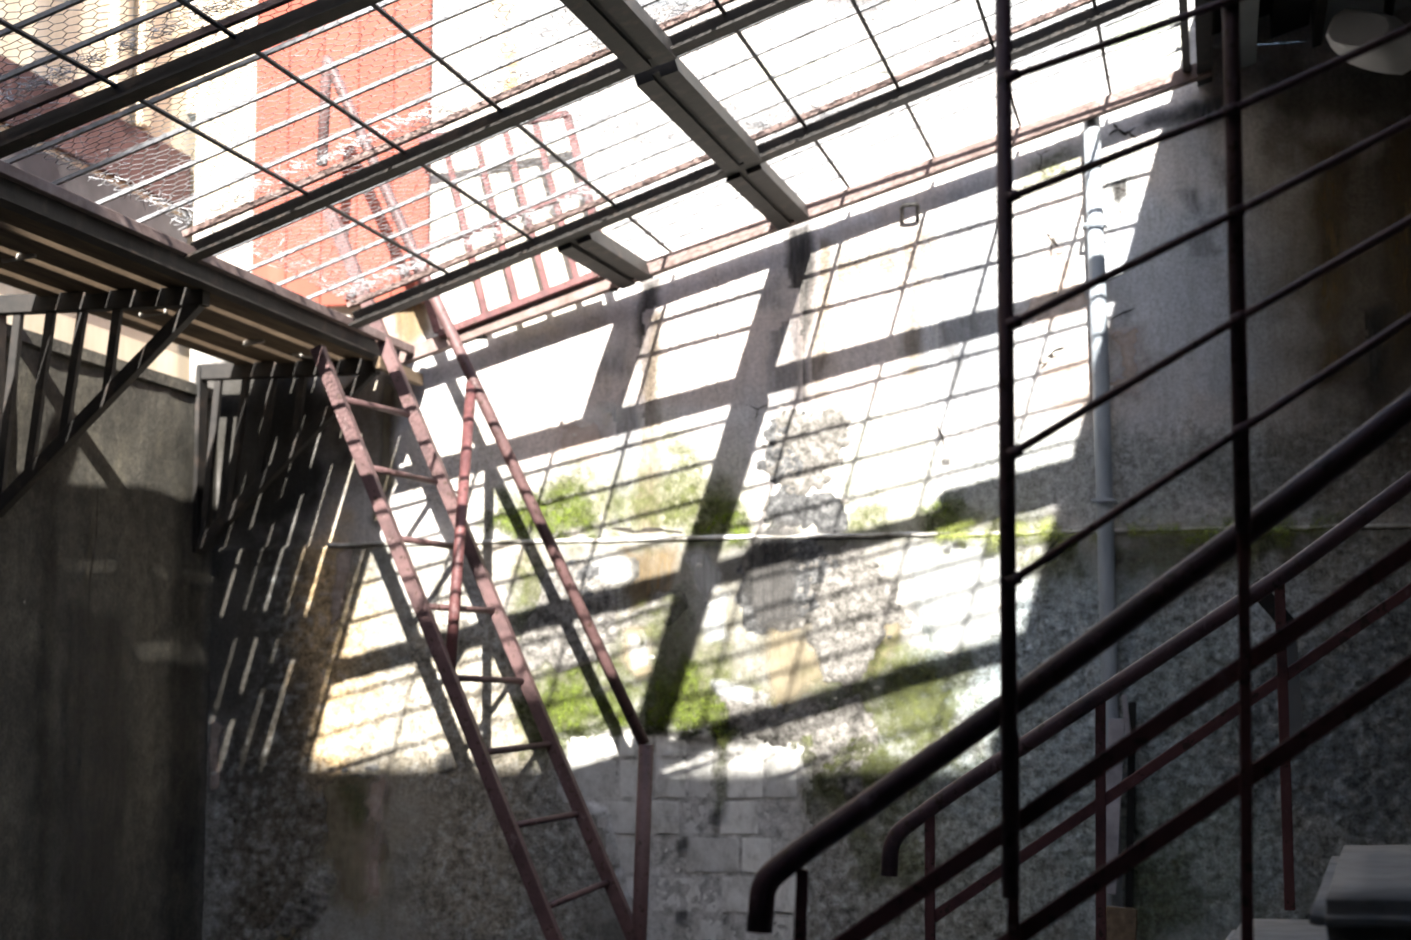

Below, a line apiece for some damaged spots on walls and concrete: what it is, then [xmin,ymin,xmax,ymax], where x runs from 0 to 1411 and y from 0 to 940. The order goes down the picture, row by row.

damp [775,223,862,403]
damp [377,375,394,496]
peeling [563,412,616,463]
damp [613,276,705,535]
damp [513,553,538,627]
spalling [518,556,689,677]
damp [630,548,676,604]
spalling [691,405,1000,800]